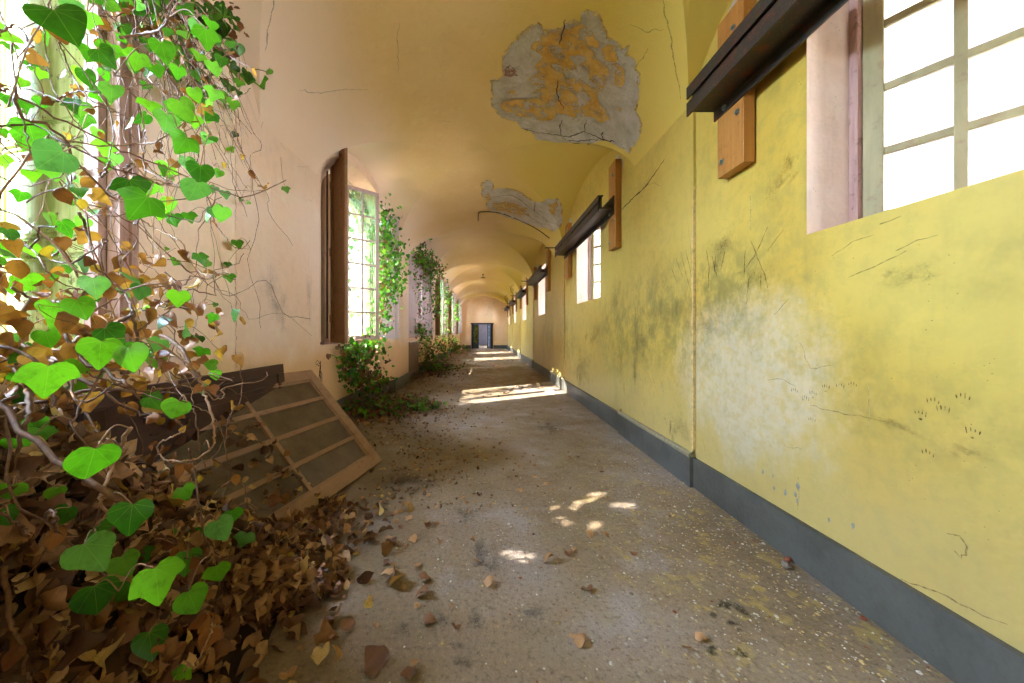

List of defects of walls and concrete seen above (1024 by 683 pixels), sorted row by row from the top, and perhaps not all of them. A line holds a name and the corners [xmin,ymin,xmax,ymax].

peeling [490,9,643,169]
peeling [480,180,573,232]
crack [623,160,664,208]